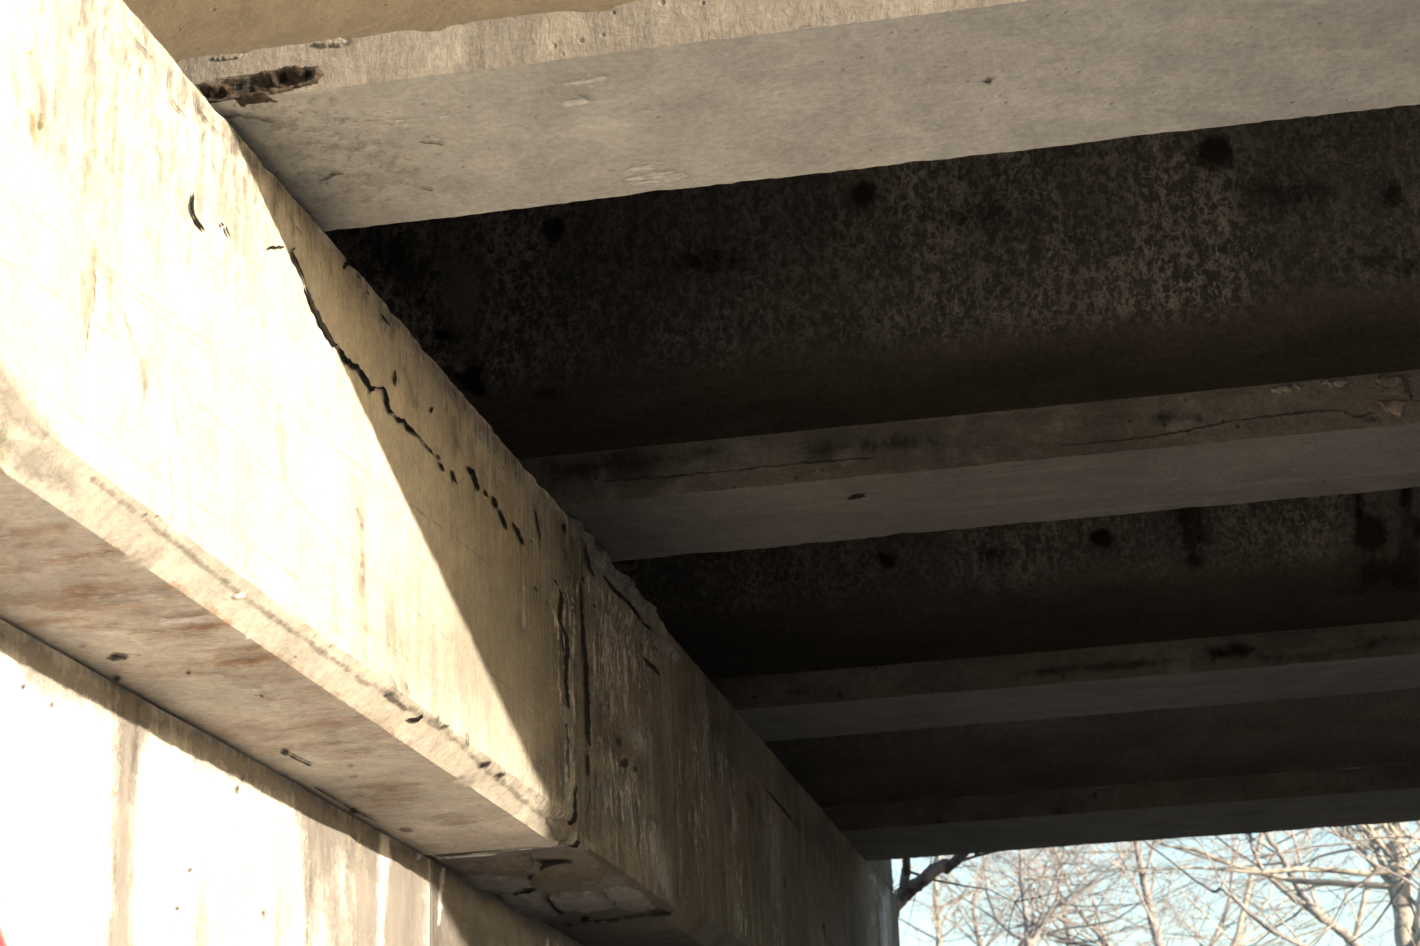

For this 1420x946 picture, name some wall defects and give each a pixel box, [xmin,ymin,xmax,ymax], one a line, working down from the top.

spalling [211,54,243,62]
spalling [314,37,352,48]
spalling [193,65,325,107]
crack [170,95,248,238]
crack [1061,409,1374,446]
crack [602,458,872,482]
crack [268,225,660,826]
water stain [548,555,747,941]
water stain [0,631,558,946]
peeling [461,874,657,919]
crack [513,860,671,927]